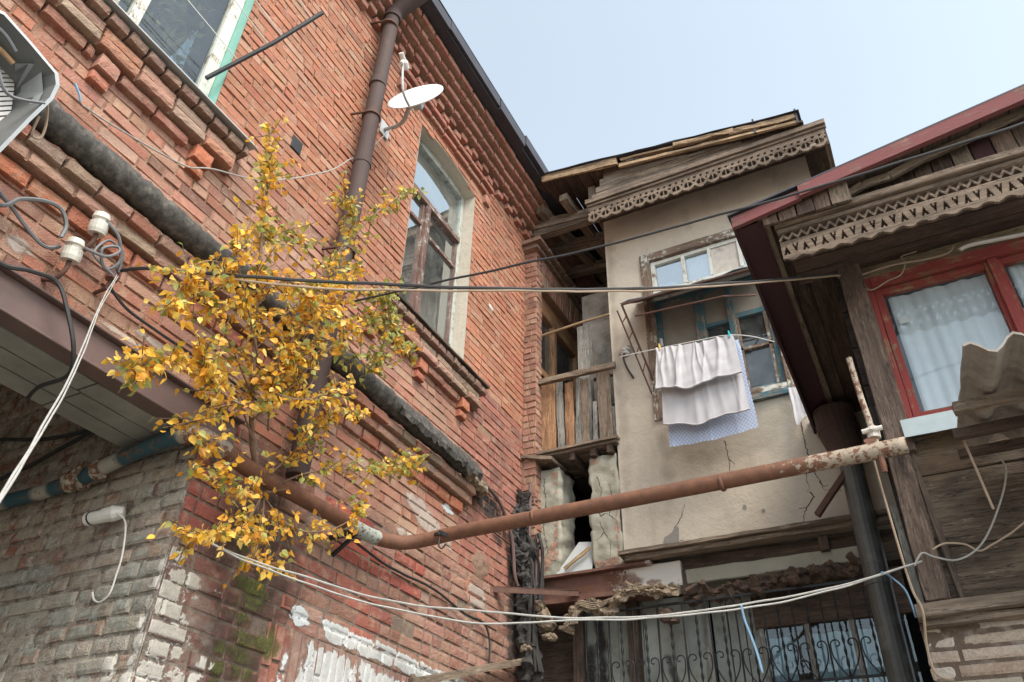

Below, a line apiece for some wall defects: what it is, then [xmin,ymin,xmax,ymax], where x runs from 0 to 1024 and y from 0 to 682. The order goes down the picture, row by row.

crack [799,422,841,522]
crack [596,477,615,556]
leakage [205,527,294,682]
peeling [277,604,466,682]
spalling [683,551,863,606]